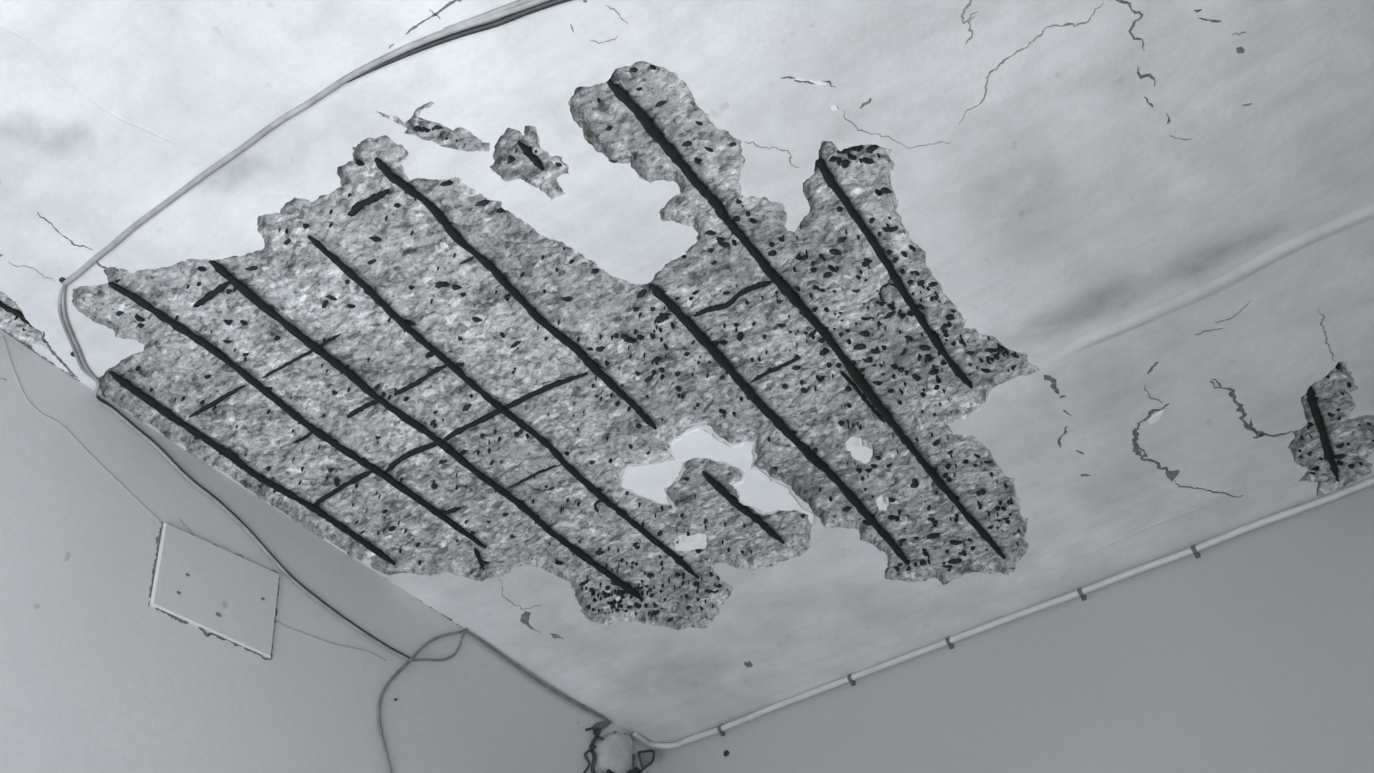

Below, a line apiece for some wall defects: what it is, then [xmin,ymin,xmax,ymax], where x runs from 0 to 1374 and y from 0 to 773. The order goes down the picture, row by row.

crack [1194,9,1246,35]
crack [781,0,1191,149]
spalling [0,291,57,355]
spalling [72,61,1040,630]
crack [1194,301,1251,335]
crack [1318,309,1336,362]
crack [1132,362,1244,498]
crack [1210,379,1293,439]
spalling [1288,361,1374,496]
peeling [520,611,563,639]